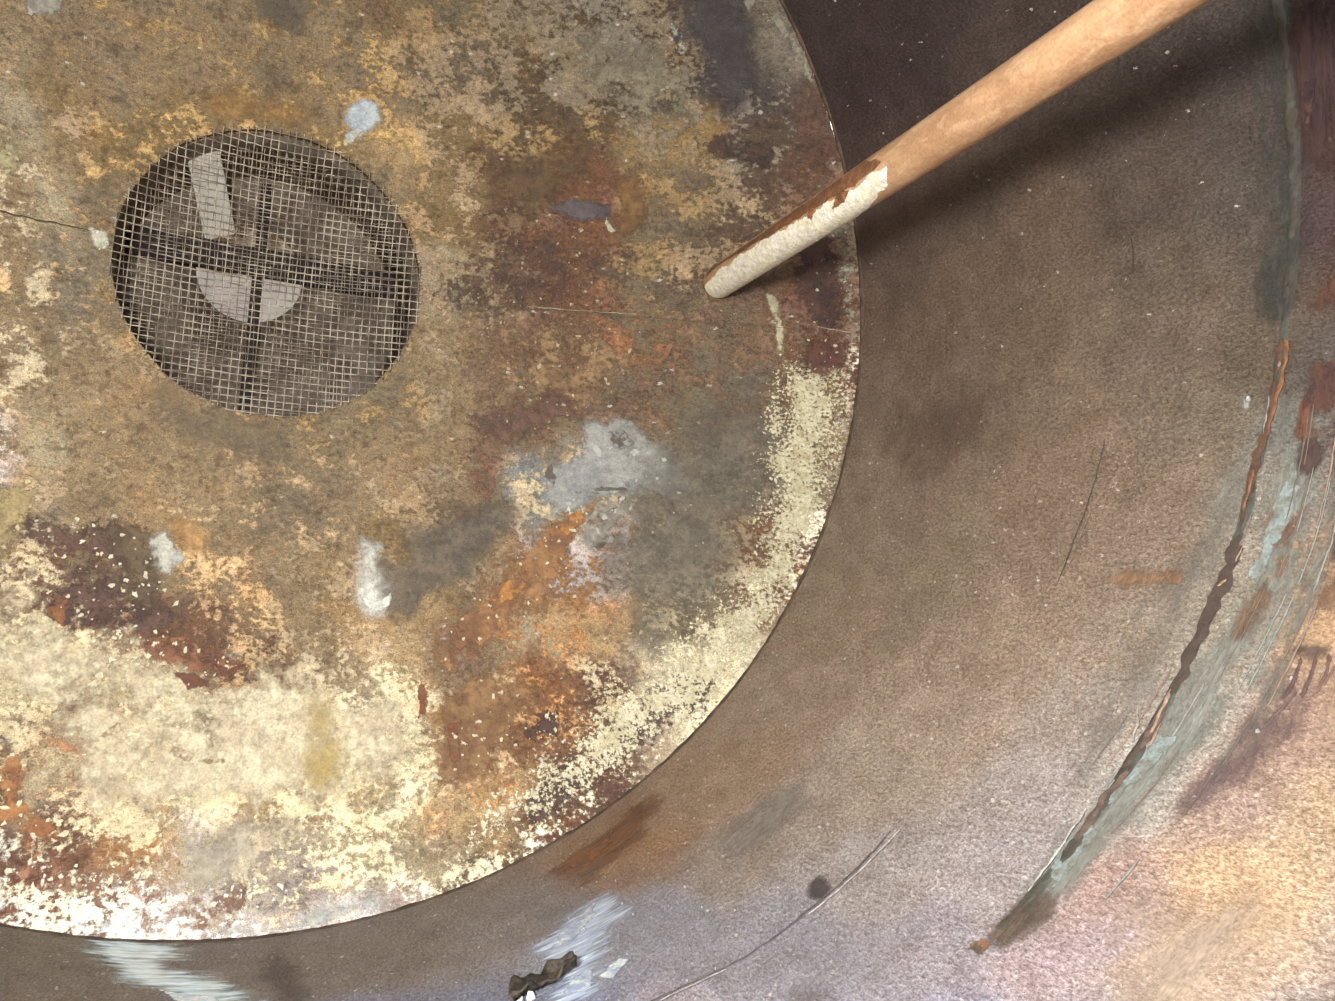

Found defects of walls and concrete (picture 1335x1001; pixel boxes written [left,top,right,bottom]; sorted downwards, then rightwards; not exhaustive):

peeling [26,0,63,16]
crack [0,210,90,233]
corrosion [426,207,647,413]
corrosion [1296,360,1335,474]
peeling [0,477,41,561]
corrosion [18,505,248,690]
spalling [105,520,185,608]
peeling [0,580,416,844]
corrosion [418,500,602,793]
peeling [433,293,854,885]
corrosion [0,753,288,930]
spalling [809,877,830,899]